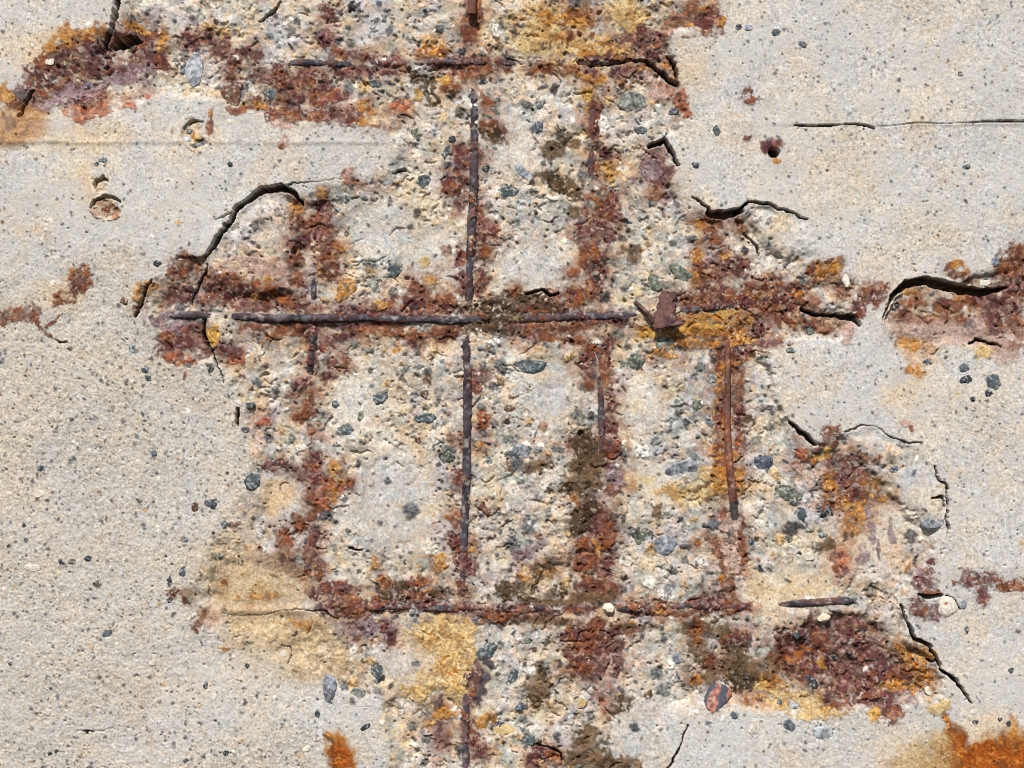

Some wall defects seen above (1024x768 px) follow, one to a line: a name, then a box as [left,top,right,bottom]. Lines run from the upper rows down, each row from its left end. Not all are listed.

spalling [185,52,203,87]
rust [0,3,411,149]
crack [195,178,342,296]
crack [691,196,807,253]
rust [506,0,1024,496]
crack [884,276,1002,314]
spalling [882,242,1024,402]
rust [131,138,752,713]
spalling [654,534,678,555]
rust [741,609,938,726]
spalling [890,651,951,713]
crack [899,593,972,704]